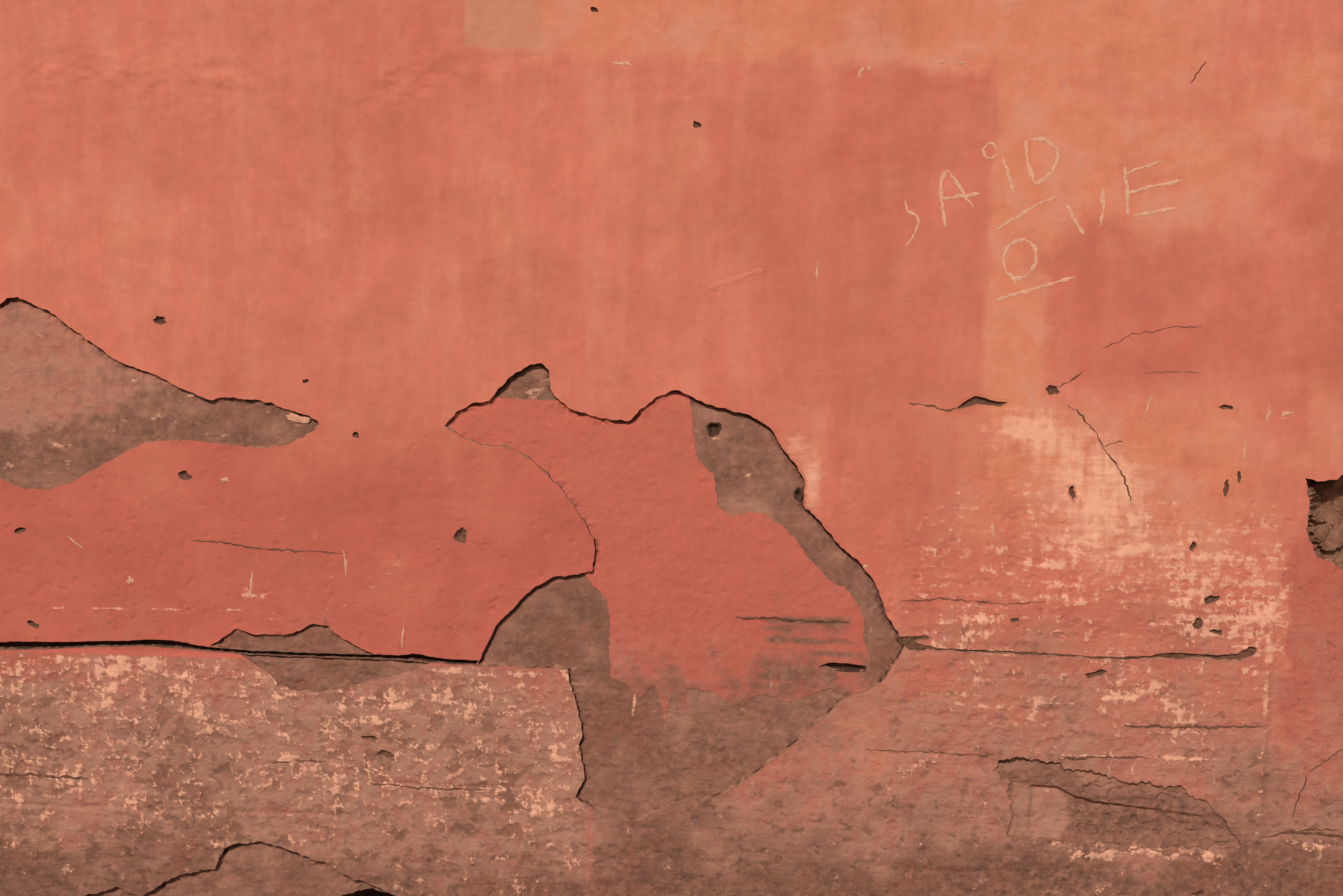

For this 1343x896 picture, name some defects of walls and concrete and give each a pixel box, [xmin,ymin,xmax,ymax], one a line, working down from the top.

peeling [0,297,319,490]
crack [910,403,955,412]
spalling [1306,475,1343,570]
peeling [445,363,904,821]
crack [899,597,1046,605]
crack [0,639,482,666]
peeling [210,624,429,693]
crack [895,635,1257,661]
spalling [992,756,1241,853]
peeling [86,841,396,896]